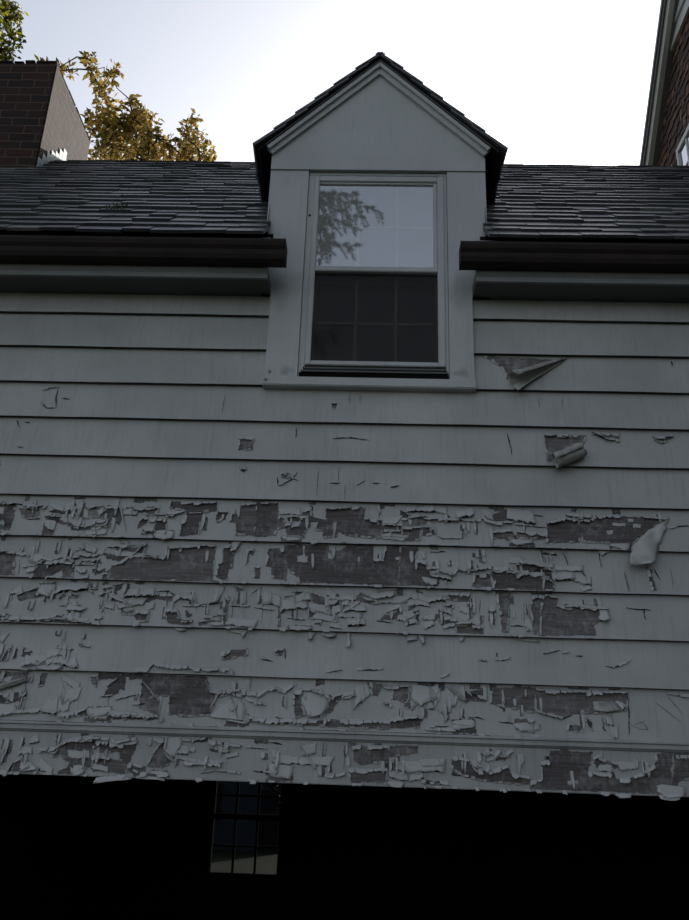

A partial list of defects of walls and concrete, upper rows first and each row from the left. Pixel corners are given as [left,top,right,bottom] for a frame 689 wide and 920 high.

peeling [483,355,568,390]
peeling [544,431,620,468]
peeling [652,434,673,444]
peeling [0,496,689,801]